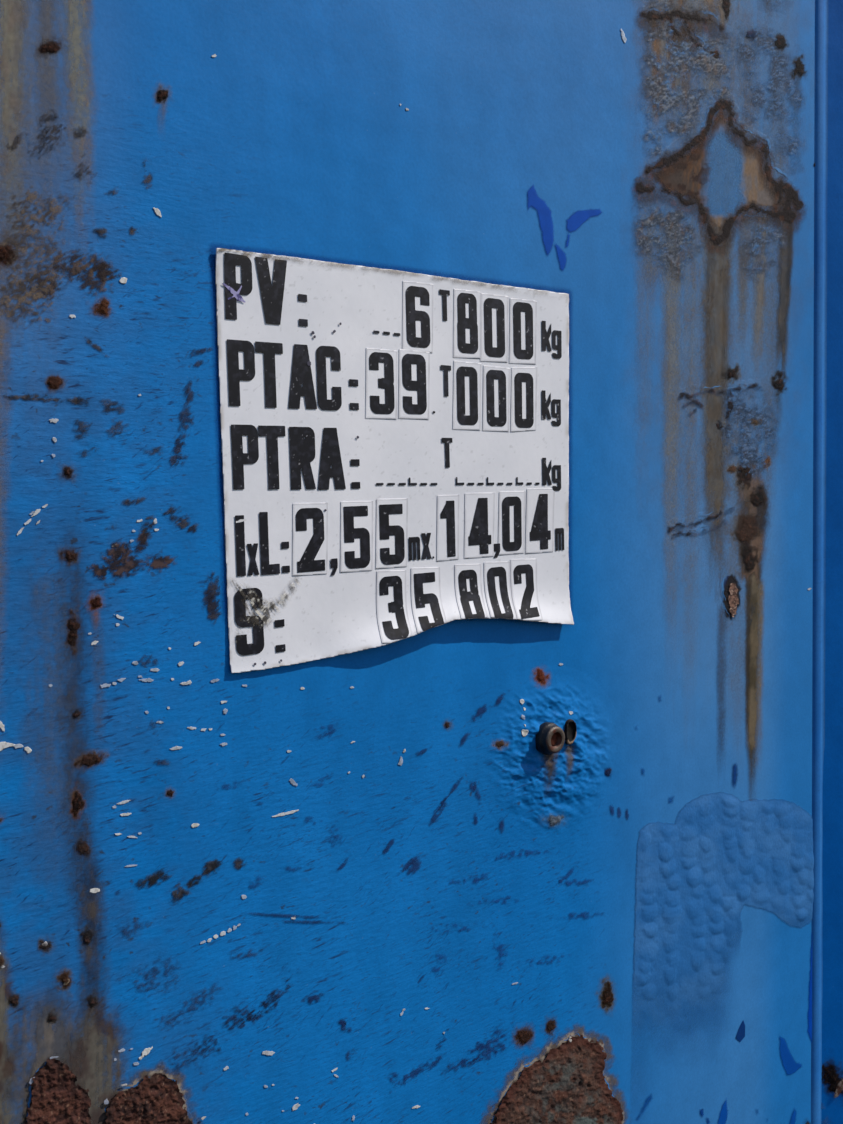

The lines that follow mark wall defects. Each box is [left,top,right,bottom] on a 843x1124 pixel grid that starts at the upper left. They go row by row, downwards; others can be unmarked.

rust [650,0,740,110]
rust [775,33,787,53]
rust [791,55,806,80]
rust [0,0,92,209]
rust [94,298,110,317]
rust [46,376,64,390]
rust [648,111,793,785]
rust [544,746,573,778]
rust [0,596,206,1124]
rust [600,978,614,1010]
rust [483,1020,627,1124]
rust [822,1063,843,1097]